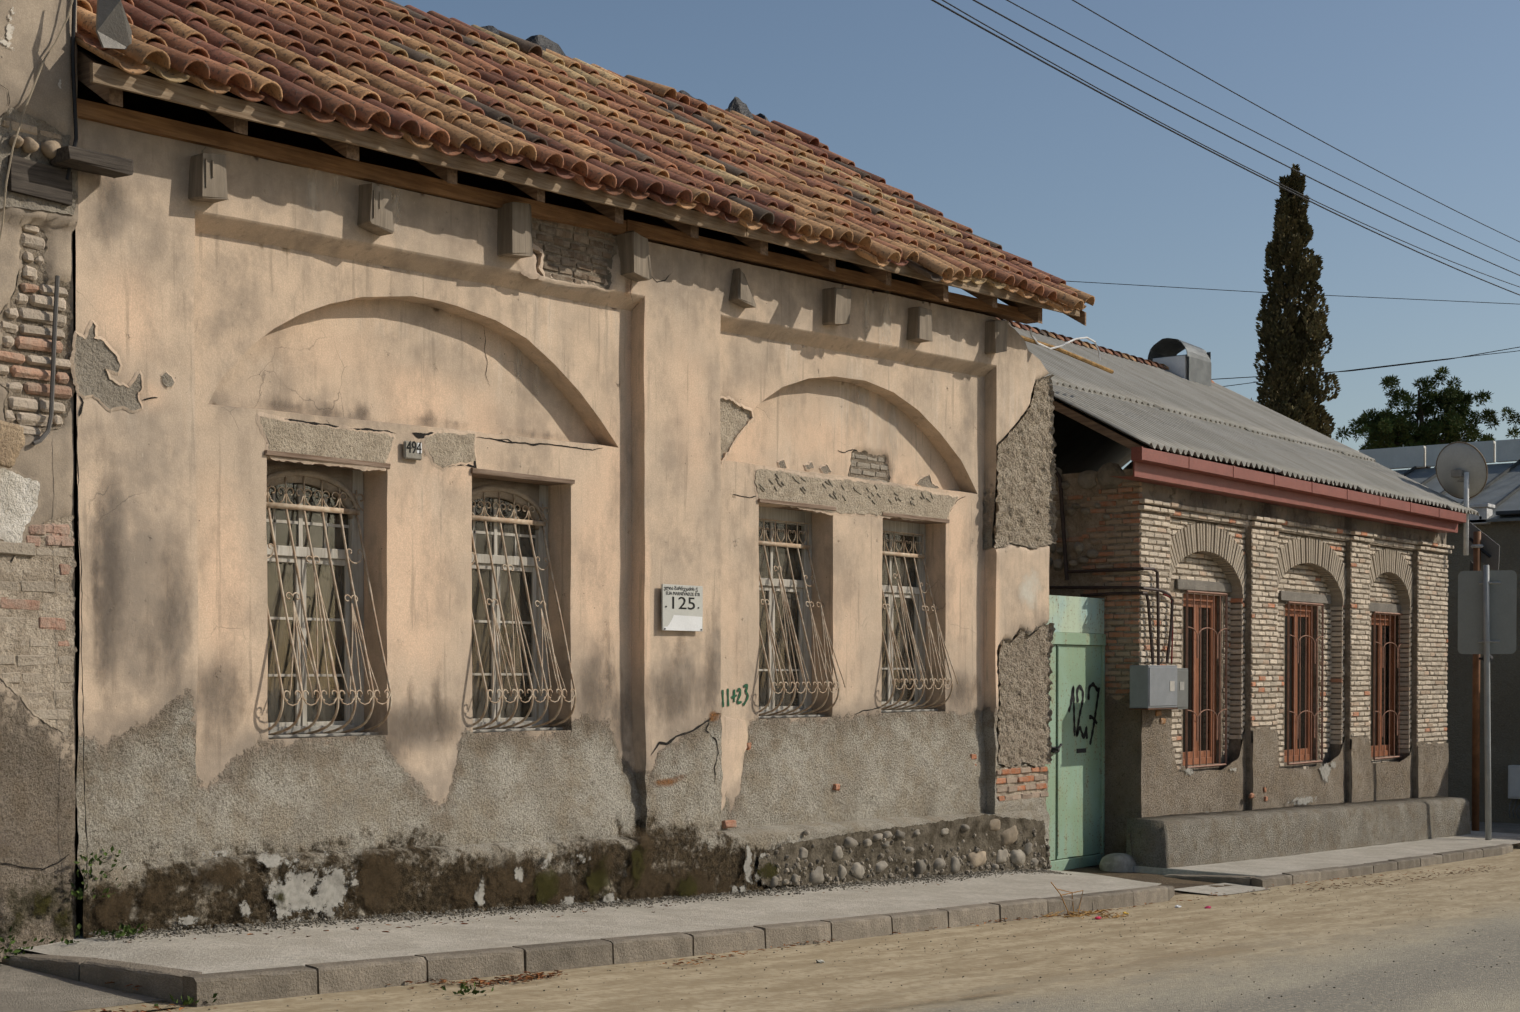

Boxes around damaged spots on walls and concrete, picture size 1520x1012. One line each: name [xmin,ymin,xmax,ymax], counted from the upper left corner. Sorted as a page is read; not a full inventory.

peeling [0,7,15,49]
flaking render [0,107,175,468]
flaking render [516,217,618,289]
flaking render [993,375,1058,548]
crack [651,713,721,783]
spalling [758,623,1056,891]
damp [96,862,255,931]
damp [352,847,402,912]
damp [444,827,744,910]